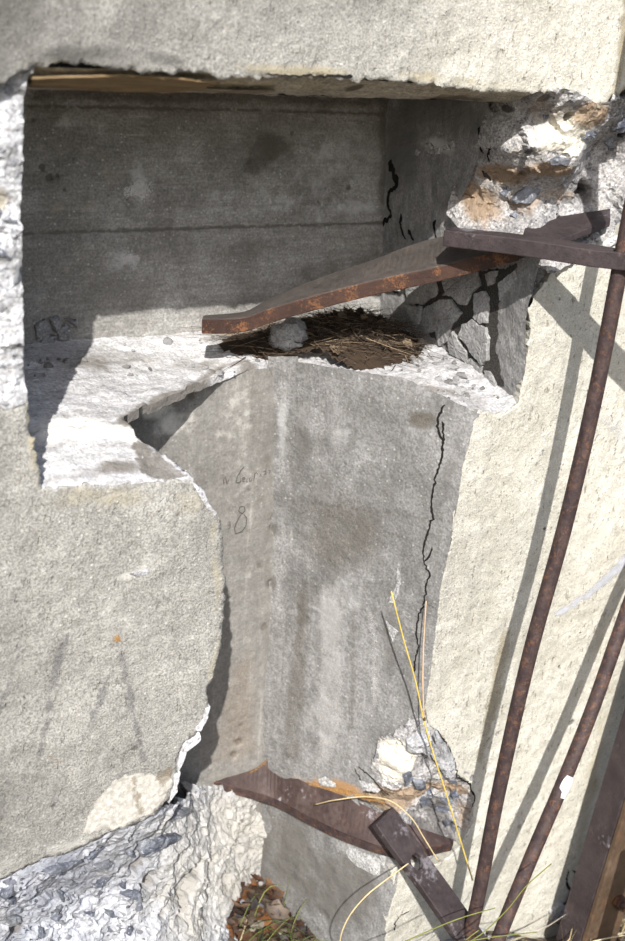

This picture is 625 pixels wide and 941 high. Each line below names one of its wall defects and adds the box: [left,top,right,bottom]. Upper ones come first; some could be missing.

spalling [0,67,78,409]
crack [382,160,437,241]
crack [392,263,517,387]
spalling [446,87,625,247]
spalling [531,259,570,297]
crack [413,405,445,672]
water stain [556,556,625,615]
spalling [0,704,267,941]
peeling [318,777,336,787]
corrosion [308,783,385,803]
peeling [346,847,386,876]
spalling [358,711,476,841]